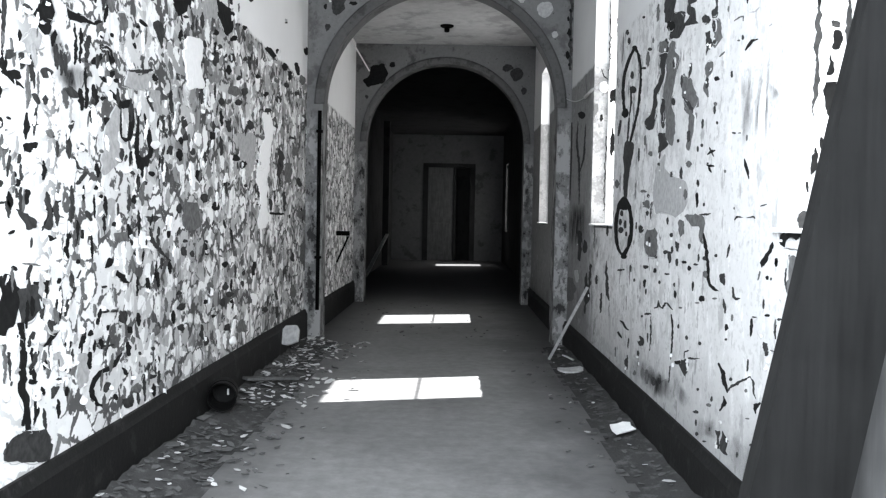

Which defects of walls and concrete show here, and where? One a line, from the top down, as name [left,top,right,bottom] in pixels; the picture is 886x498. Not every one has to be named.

spalling [313,0,358,34]
spalling [363,62,395,99]
peeling [811,0,853,117]
spalling [629,0,733,304]
peeling [806,137,823,193]
spalling [0,0,307,465]
crack [685,213,740,313]
crack [757,242,774,280]
spalling [774,210,806,303]
crack [750,316,777,339]
crack [718,359,761,414]